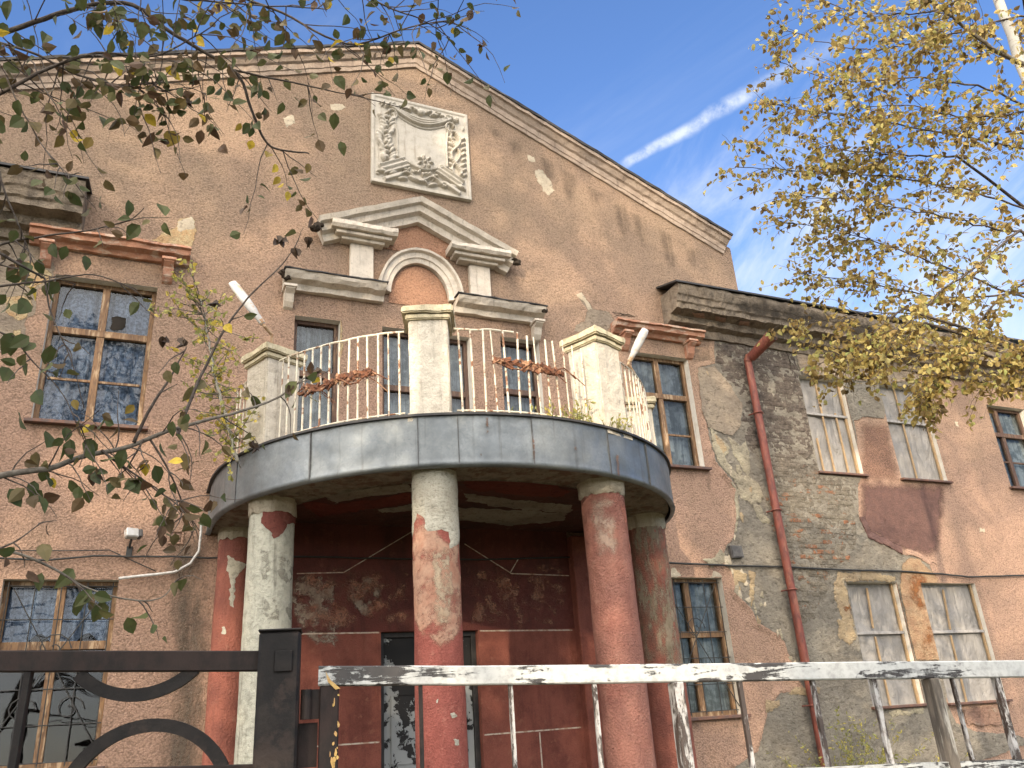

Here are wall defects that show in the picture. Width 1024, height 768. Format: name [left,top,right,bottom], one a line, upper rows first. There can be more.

peeling [528,155,555,195]
peeling [153,217,197,247]
peeling [702,341,939,662]
water stain [863,427,942,553]
peeling [226,555,246,607]
peeling [261,468,573,646]
peeling [735,679,940,768]
peeling [940,679,1024,761]